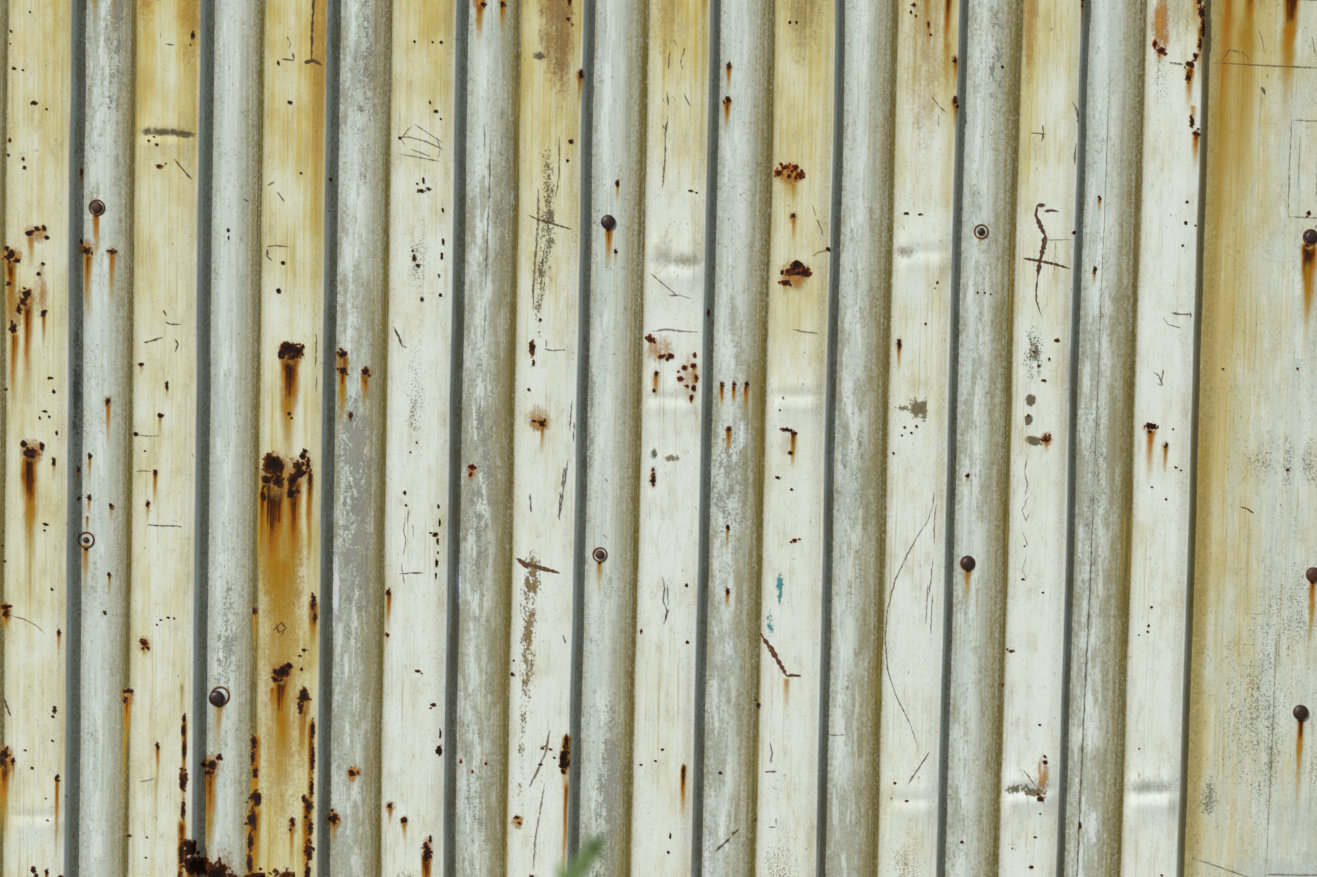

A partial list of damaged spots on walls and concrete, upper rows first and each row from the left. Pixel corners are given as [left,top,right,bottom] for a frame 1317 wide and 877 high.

corrosion [1152,0,1168,57]
corrosion [1284,0,1299,70]
corrosion [774,162,805,188]
corrosion [1,225,49,383]
corrosion [778,260,812,287]
corrosion [1301,242,1317,305]
corrosion [278,341,305,423]
corrosion [645,333,699,403]
corrosion [20,430,58,533]
corrosion [255,448,313,601]
corrosion [309,592,317,635]
corrosion [177,662,341,877]